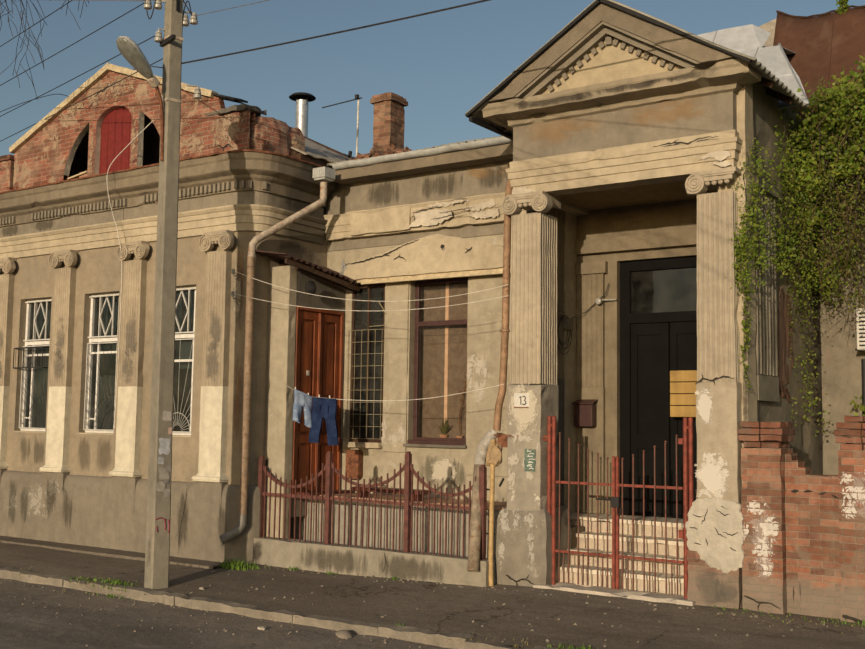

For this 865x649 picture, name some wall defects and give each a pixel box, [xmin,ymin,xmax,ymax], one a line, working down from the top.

peeling [180,114,243,153]
crack [654,136,718,147]
spalling [408,199,499,228]
spalling [777,287,794,402]
peeling [466,354,489,405]
peeling [695,388,714,424]
peeling [507,384,538,494]
water stain [7,480,60,516]
peeling [695,453,730,499]
peeling [840,474,865,519]
peeling [498,508,537,565]
peeling [743,499,779,576]